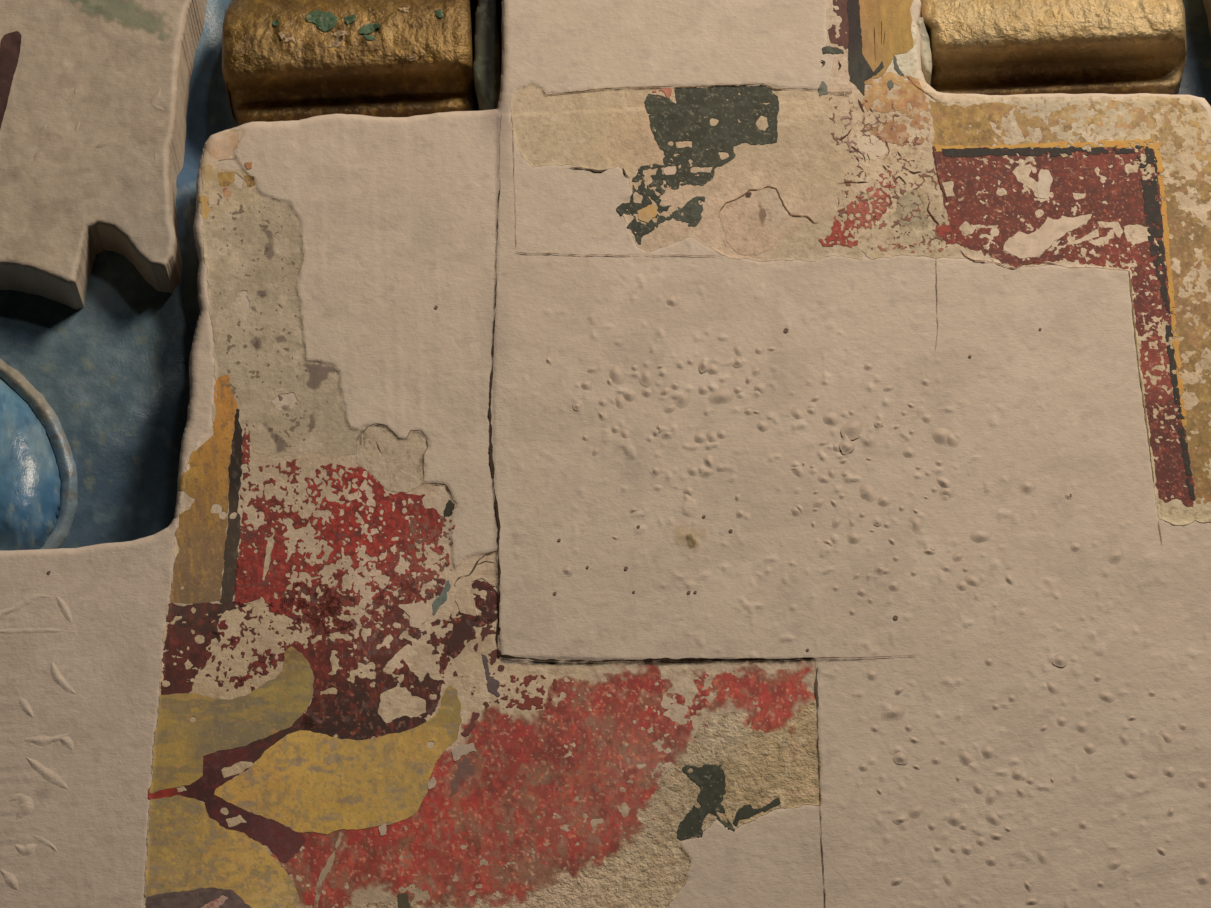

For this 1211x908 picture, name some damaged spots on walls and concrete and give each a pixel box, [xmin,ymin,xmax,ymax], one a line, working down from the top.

peeling [144,129,822,908]
crack [488,116,918,907]
peeling [510,0,1211,525]